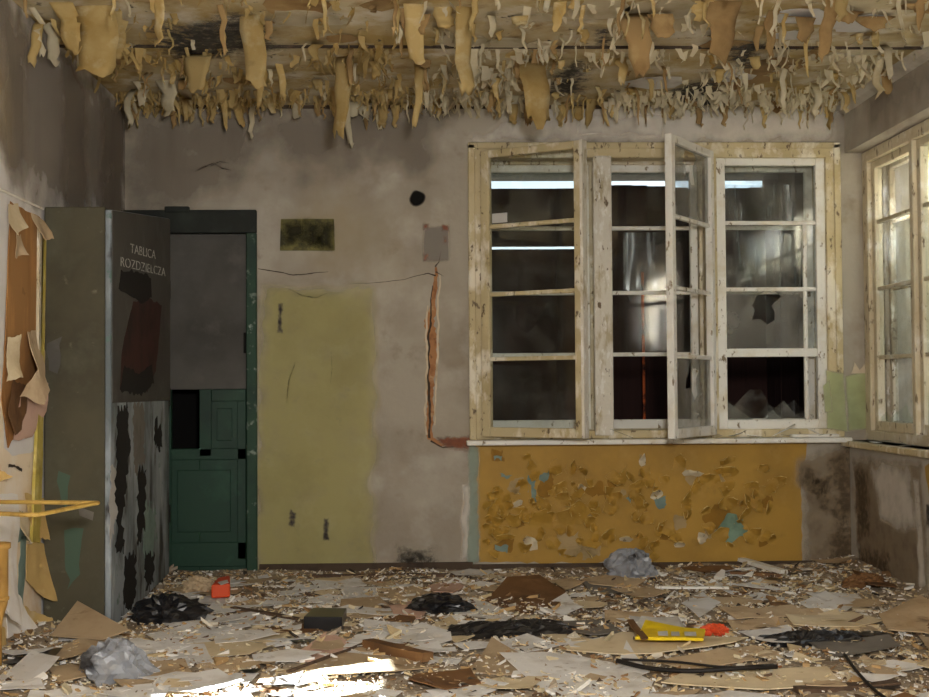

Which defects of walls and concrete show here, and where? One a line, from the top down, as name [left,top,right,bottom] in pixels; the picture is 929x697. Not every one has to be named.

peeling [0,464,22,481]
peeling [0,493,57,646]
peeling [462,446,787,564]
water stain [798,445,929,591]